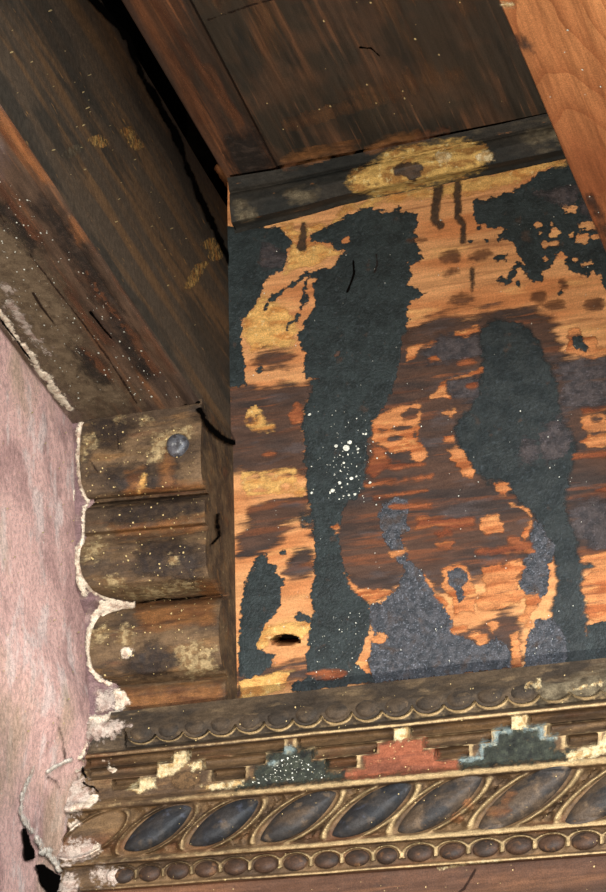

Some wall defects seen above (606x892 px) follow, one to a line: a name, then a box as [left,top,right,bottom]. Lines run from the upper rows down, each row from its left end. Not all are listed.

damp [430,181,492,305]
peeling [472,160,606,289]
damp [251,349,296,371]
damp [230,377,319,478]
peeling [227,205,606,692]
damp [337,292,606,602]
damp [0,225,226,892]
damp [235,487,315,558]
damp [281,547,315,580]
damp [457,606,525,669]
spalling [19,767,63,892]
damp [127,751,244,794]